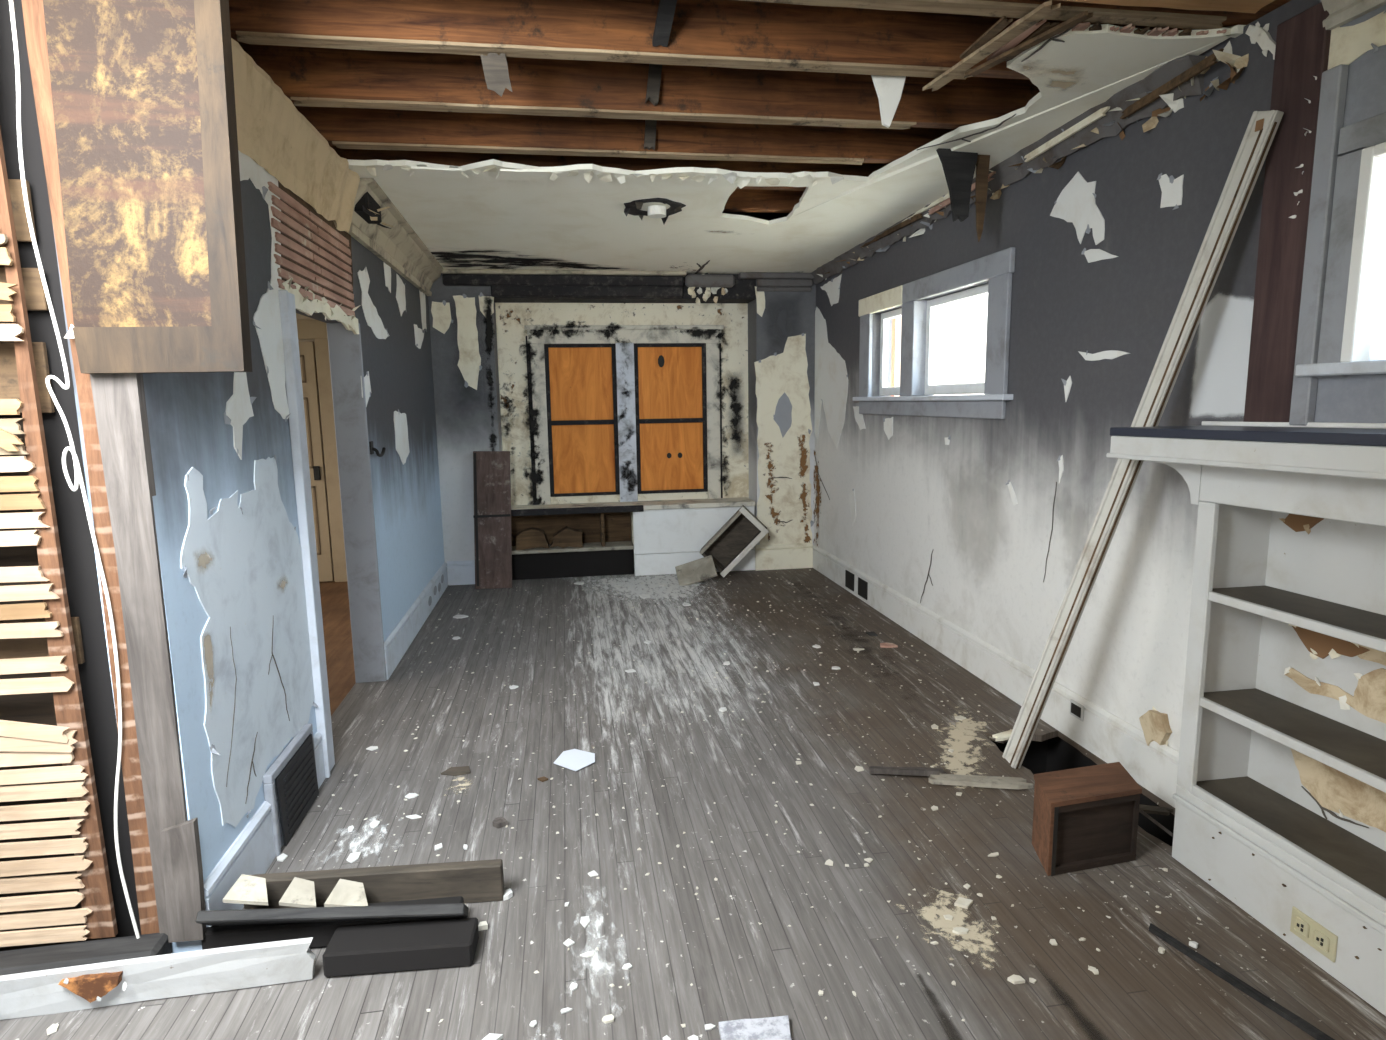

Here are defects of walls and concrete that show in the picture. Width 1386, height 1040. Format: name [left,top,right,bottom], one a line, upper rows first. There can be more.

peeling [410,164,643,184]
peeling [1078,350,1131,361]
peeling [1190,294,1254,417]
peeling [754,196,947,545]
peeling [1061,376,1072,402]
peeling [180,150,494,828]
peeling [1310,648,1341,659]
peeling [1339,695,1350,710]